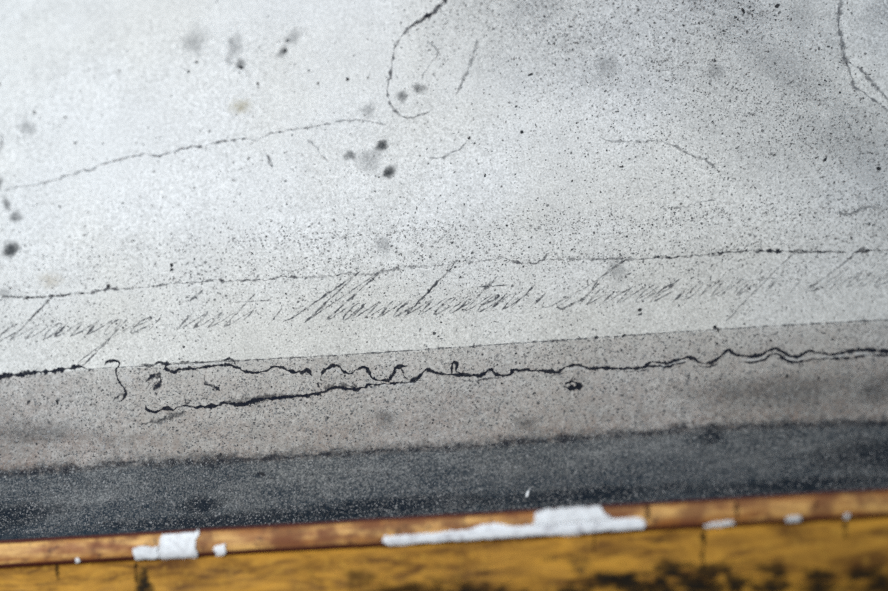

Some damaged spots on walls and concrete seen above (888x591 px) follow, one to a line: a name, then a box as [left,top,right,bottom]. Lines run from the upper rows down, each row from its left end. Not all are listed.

crack [387,0,447,118]
crack [0,347,888,424]